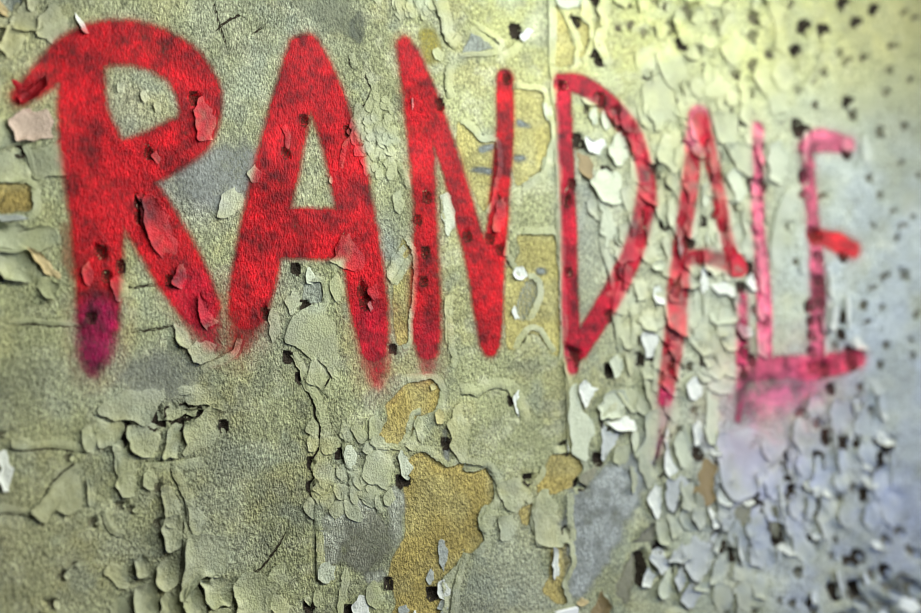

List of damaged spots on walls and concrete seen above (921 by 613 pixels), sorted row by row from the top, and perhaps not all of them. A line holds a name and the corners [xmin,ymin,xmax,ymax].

peeling [0,0,89,59]
peeling [0,75,70,222]
spalling [247,165,262,183]
peeling [261,0,921,613]
spalling [58,561,80,580]